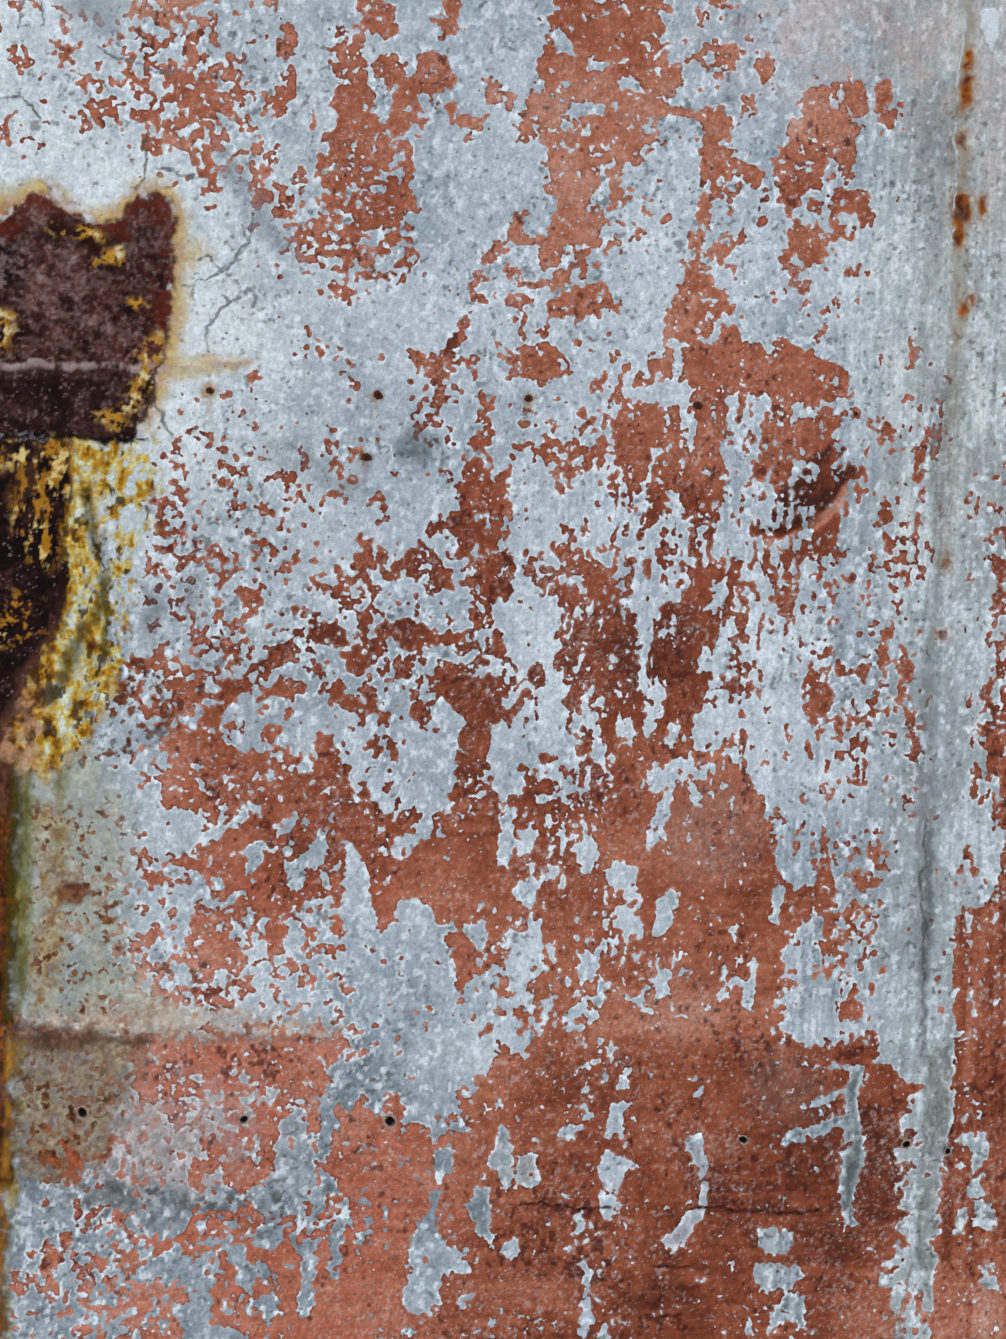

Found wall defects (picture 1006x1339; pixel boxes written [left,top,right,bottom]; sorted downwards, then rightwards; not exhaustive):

peeling [7,44,35,76]
corrosion [960,50,974,107]
peeling [49,0,498,306]
corrosion [952,193,987,246]
corrosion [958,294,974,318]
peeling [293,325,385,404]
peeling [406,310,487,449]
corrosion [0,179,250,1339]
peeling [362,734,406,773]
peeling [675,728,788,847]
crack [520,1201,610,1211]
crack [695,1205,820,1215]